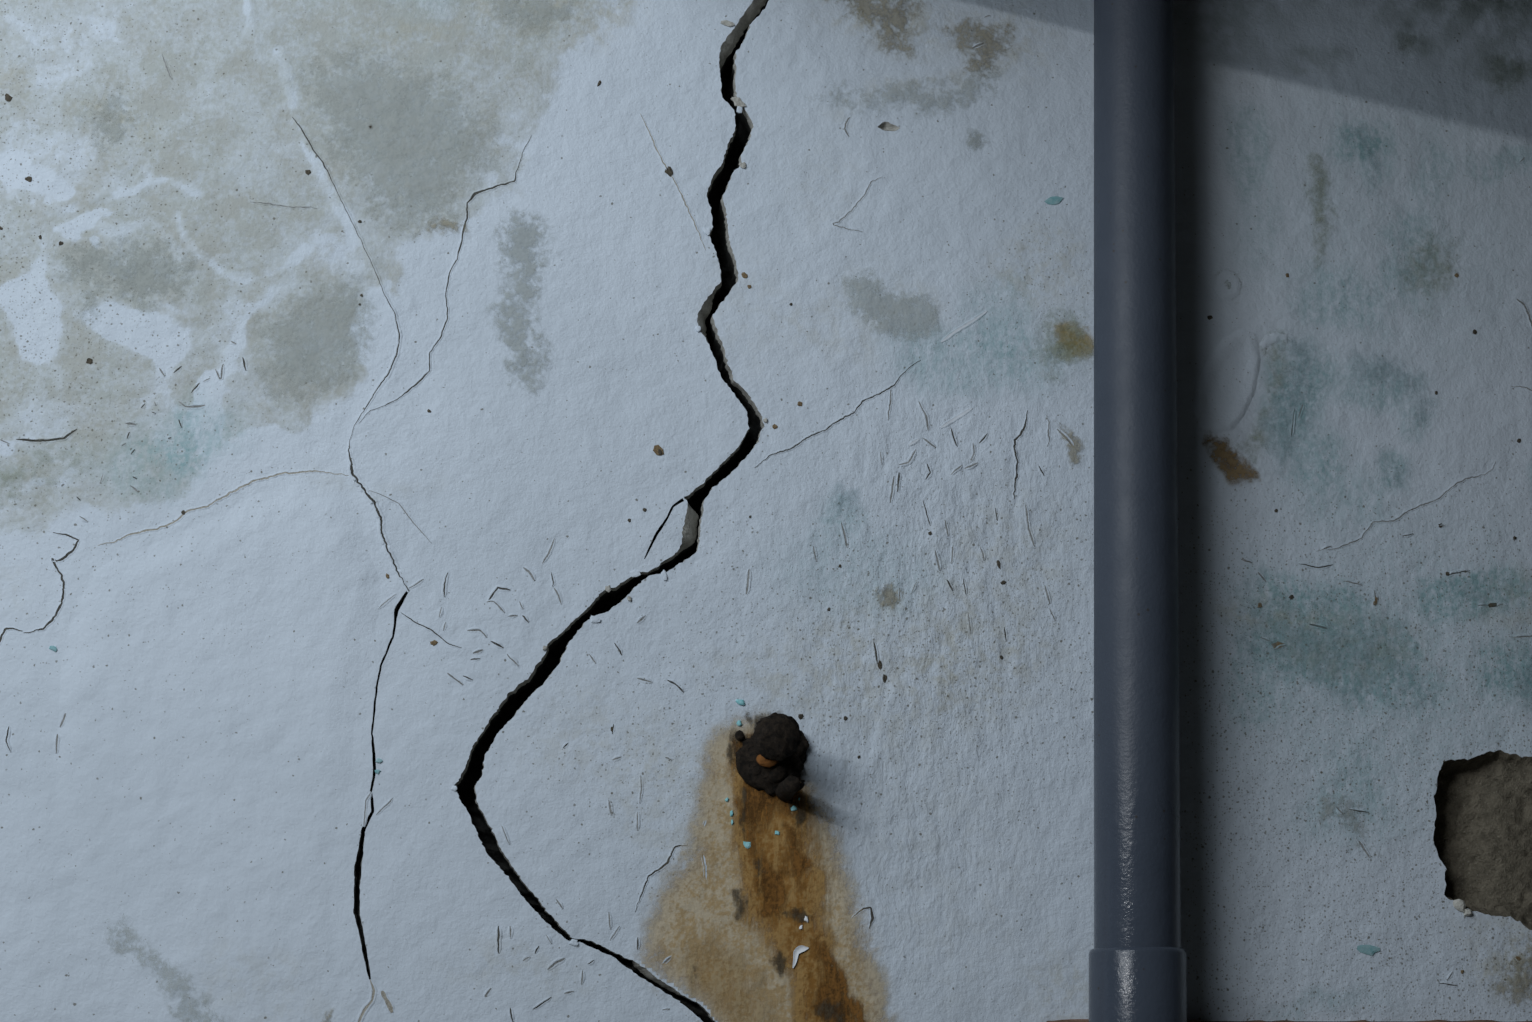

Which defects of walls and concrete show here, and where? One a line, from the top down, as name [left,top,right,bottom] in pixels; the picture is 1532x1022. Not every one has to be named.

leakage [499,217,546,385]
crack [0,117,532,1022]
crack [451,0,921,1022]
rust [643,699,887,1022]
spalling [1433,750,1532,930]